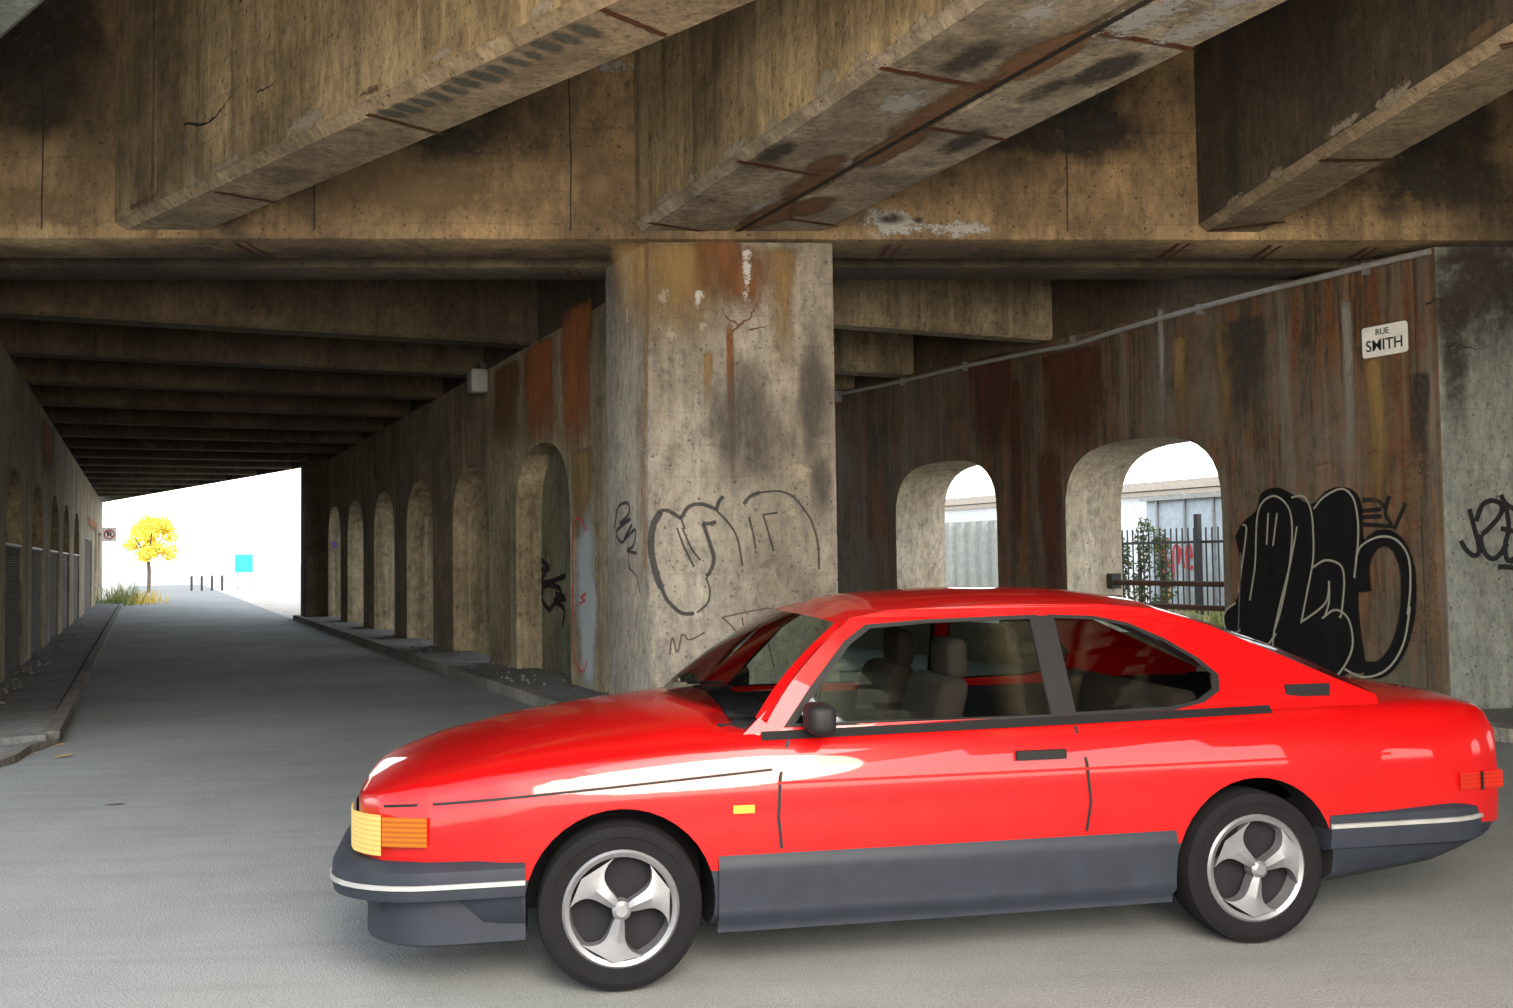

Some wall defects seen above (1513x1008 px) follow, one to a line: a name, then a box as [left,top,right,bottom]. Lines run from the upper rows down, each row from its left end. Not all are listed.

leakage [0,0,98,132]
leakage [758,144,793,161]
leakage [872,90,934,115]
corrosion [617,28,1196,336]
leakage [942,0,1255,158]
leakage [1361,106,1505,208]
corrosion [704,327,768,473]
crack [719,293,767,446]